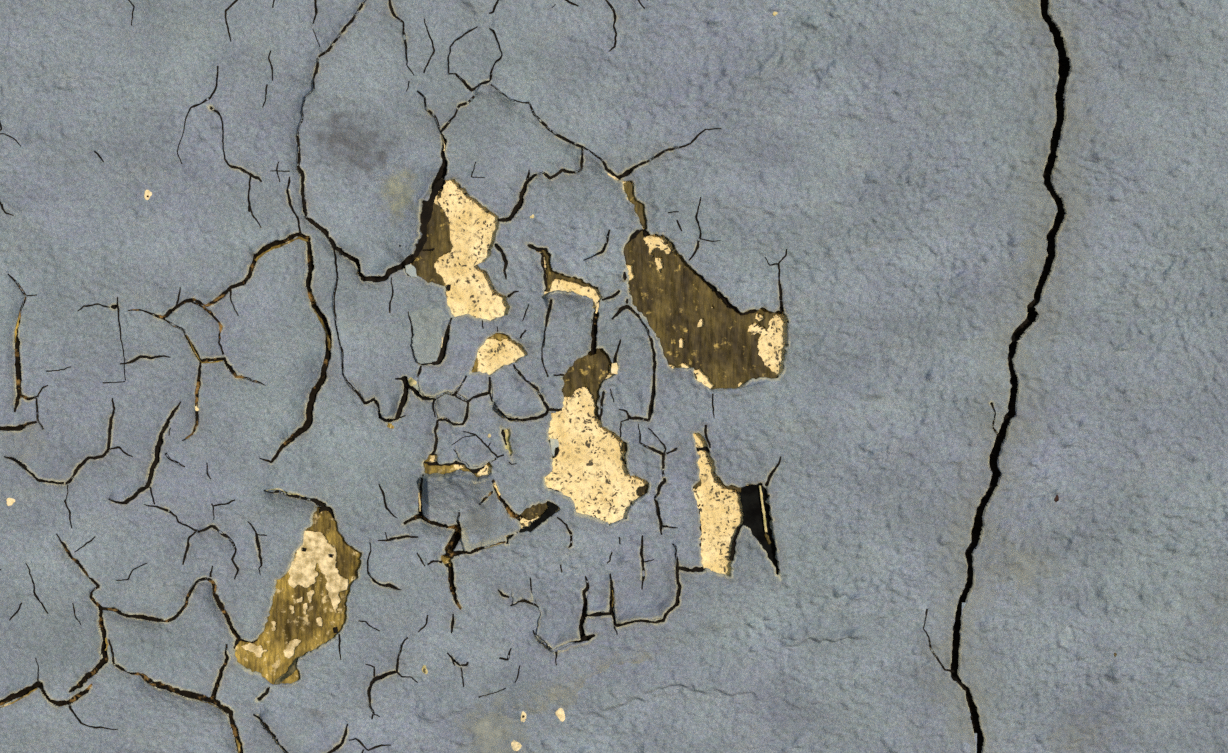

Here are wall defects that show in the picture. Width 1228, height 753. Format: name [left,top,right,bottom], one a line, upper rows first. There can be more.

peeling [233,504,362,685]
crack [0,0,722,753]
peeling [405,178,528,375]
peeling [506,348,649,544]
peeling [623,181,788,390]
peeling [693,433,779,575]
crack [765,456,781,486]
crack [765,249,787,312]
crack [923,0,1072,753]